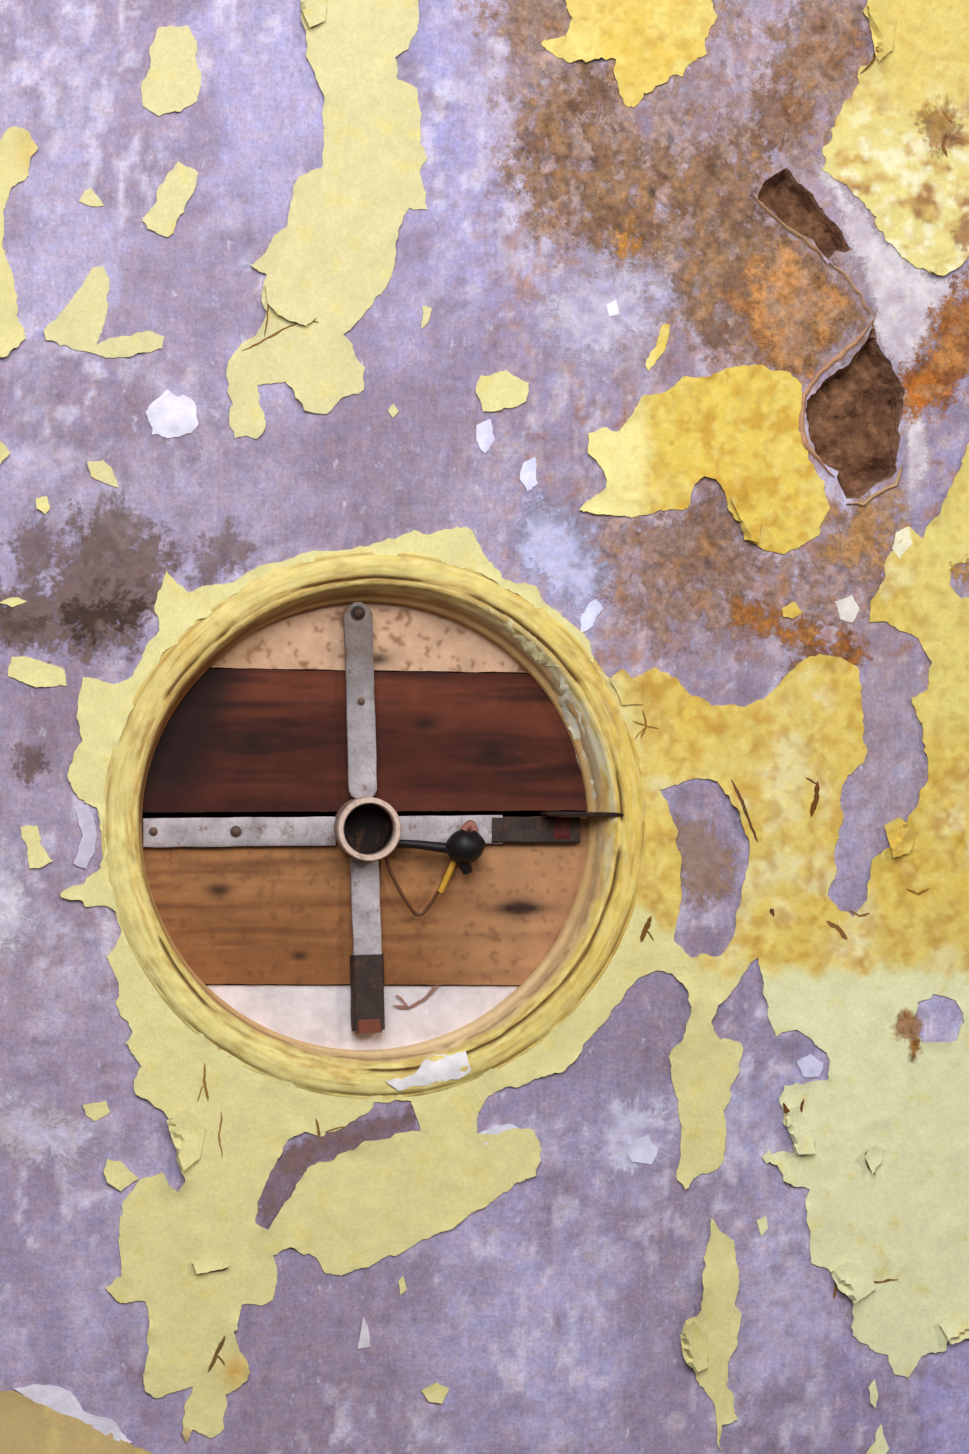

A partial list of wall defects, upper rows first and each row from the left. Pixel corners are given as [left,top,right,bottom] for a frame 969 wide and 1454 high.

peeling [0,126,38,358]
peeling [226,0,428,439]
peeling [541,0,717,108]
rust [459,0,876,389]
rust [916,99,963,157]
flaking render [146,390,199,438]
peeling [578,168,905,554]
rust [897,273,969,424]
leakage [0,492,256,664]
rust [566,477,911,672]
peeling [60,443,969,1454]
rust [896,1009,923,1061]